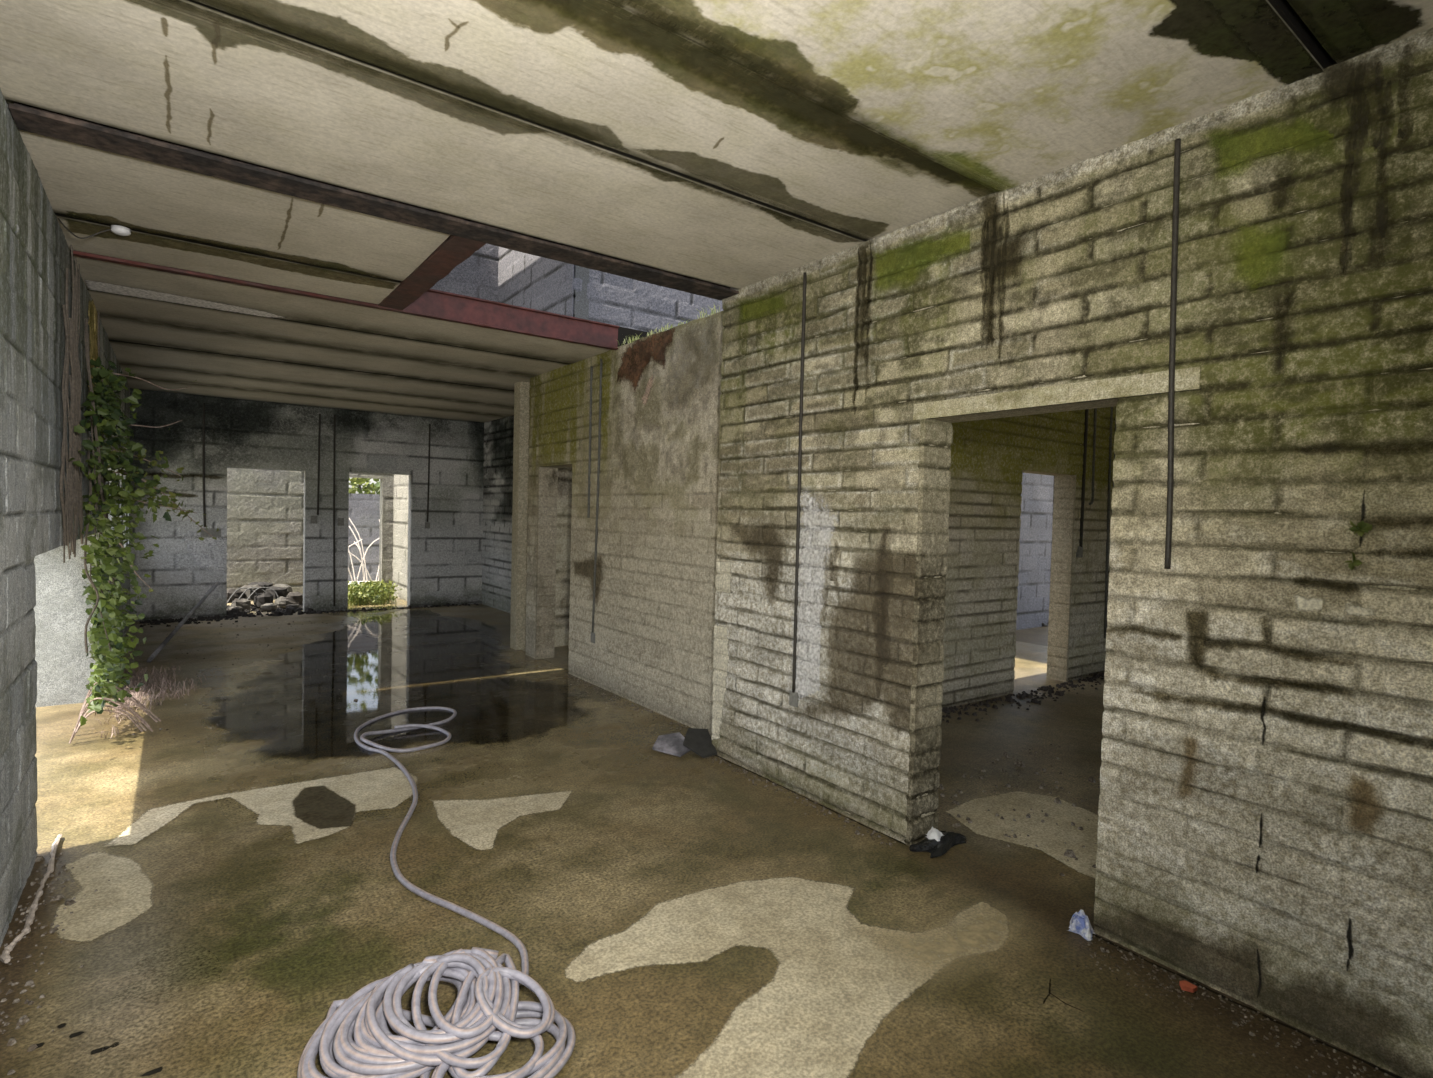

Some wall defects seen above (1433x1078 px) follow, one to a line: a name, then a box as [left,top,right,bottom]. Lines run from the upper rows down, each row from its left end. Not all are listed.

damp [158,0,793,221]
damp [483,0,1023,367]
damp [1149,0,1422,278]
damp [790,491,836,700]
crack [1093,934,1402,1078]
crack [1346,918,1354,970]